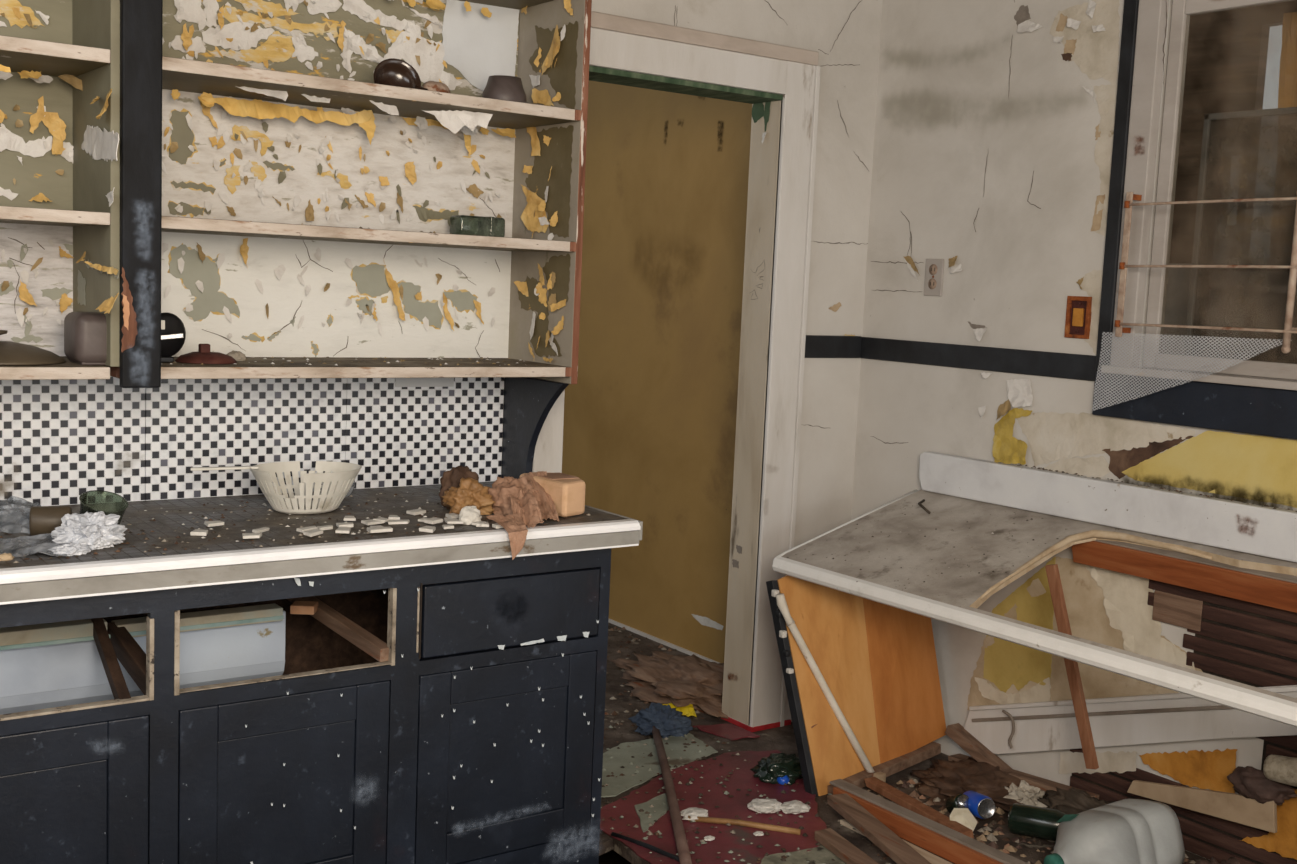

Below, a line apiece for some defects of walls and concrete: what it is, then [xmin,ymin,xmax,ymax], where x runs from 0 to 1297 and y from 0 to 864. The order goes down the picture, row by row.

peeling [0,0,49,28]
peeling [162,0,578,109]
peeling [0,64,119,202]
peeling [162,86,574,240]
peeling [1014,0,1120,236]
peeling [0,237,138,352]
peeling [161,238,495,358]
peeling [514,254,571,363]
spalling [978,379,1297,508]
damp [1124,478,1292,510]
peeling [992,557,1056,630]
peeling [983,635,1052,693]